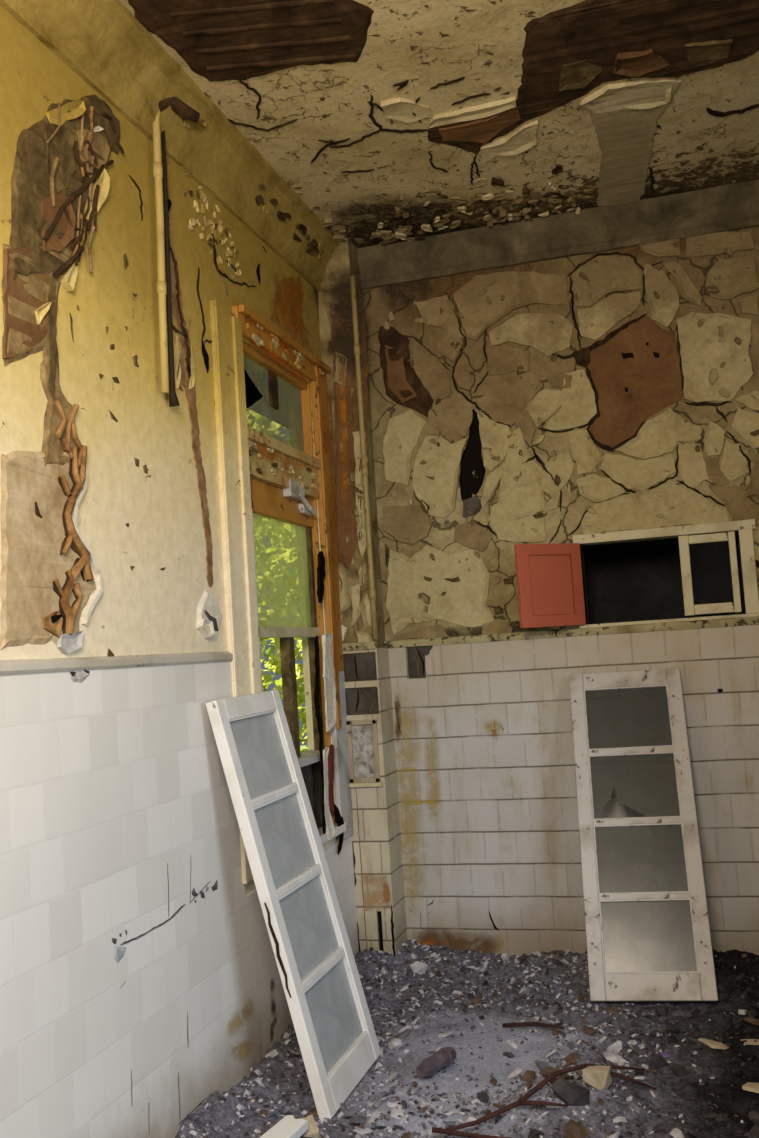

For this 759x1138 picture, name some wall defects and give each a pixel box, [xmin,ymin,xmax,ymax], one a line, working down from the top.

flaking render [128,0,374,81]
crack [227,80,297,131]
crack [311,77,491,185]
flaking render [380,0,759,164]
crack [706,104,759,117]
peeling [255,183,324,259]
peeling [309,164,583,247]
crack [552,252,663,360]
flaking render [0,94,124,654]
crack [412,294,751,544]
peeling [246,231,759,855]
crack [112,863,218,987]